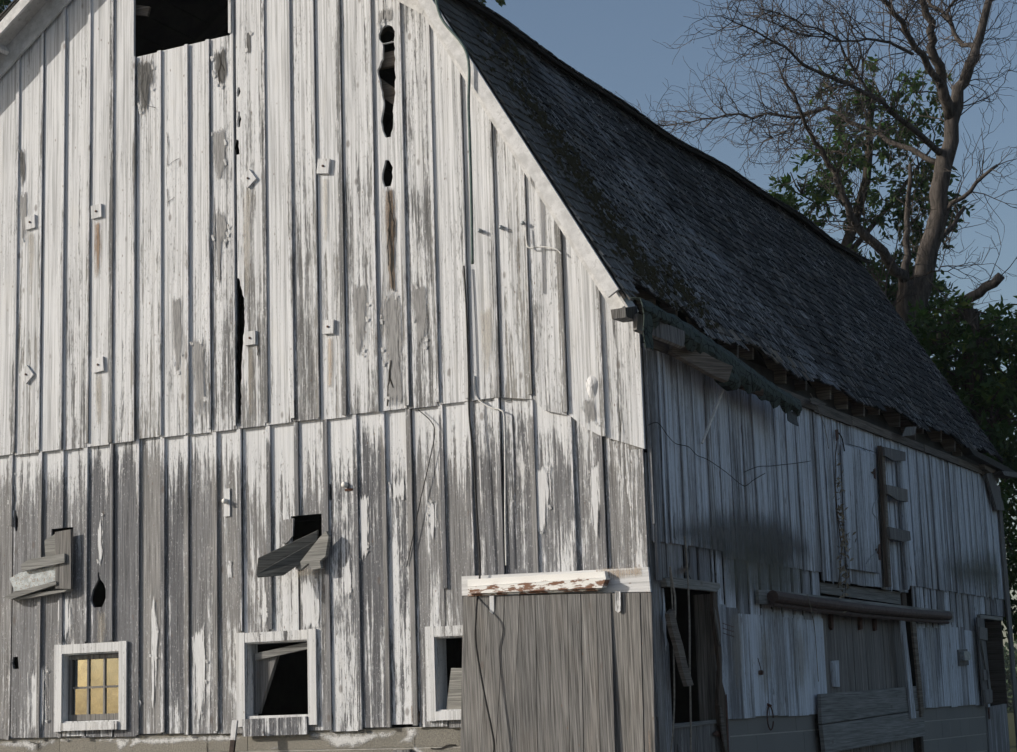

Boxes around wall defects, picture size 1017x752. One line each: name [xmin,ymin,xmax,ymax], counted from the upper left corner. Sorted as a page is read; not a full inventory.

peeling [137,59,153,114]
peeling [210,46,227,89]
peeling [18,149,27,242]
peeling [211,211,229,283]
peeling [172,298,207,415]
peeling [342,495,369,599]
peeling [27,668,48,730]
peeling [55,596,71,639]
peeling [139,595,159,708]
peeling [192,627,208,719]
peeling [259,593,268,626]
peeling [301,578,322,630]